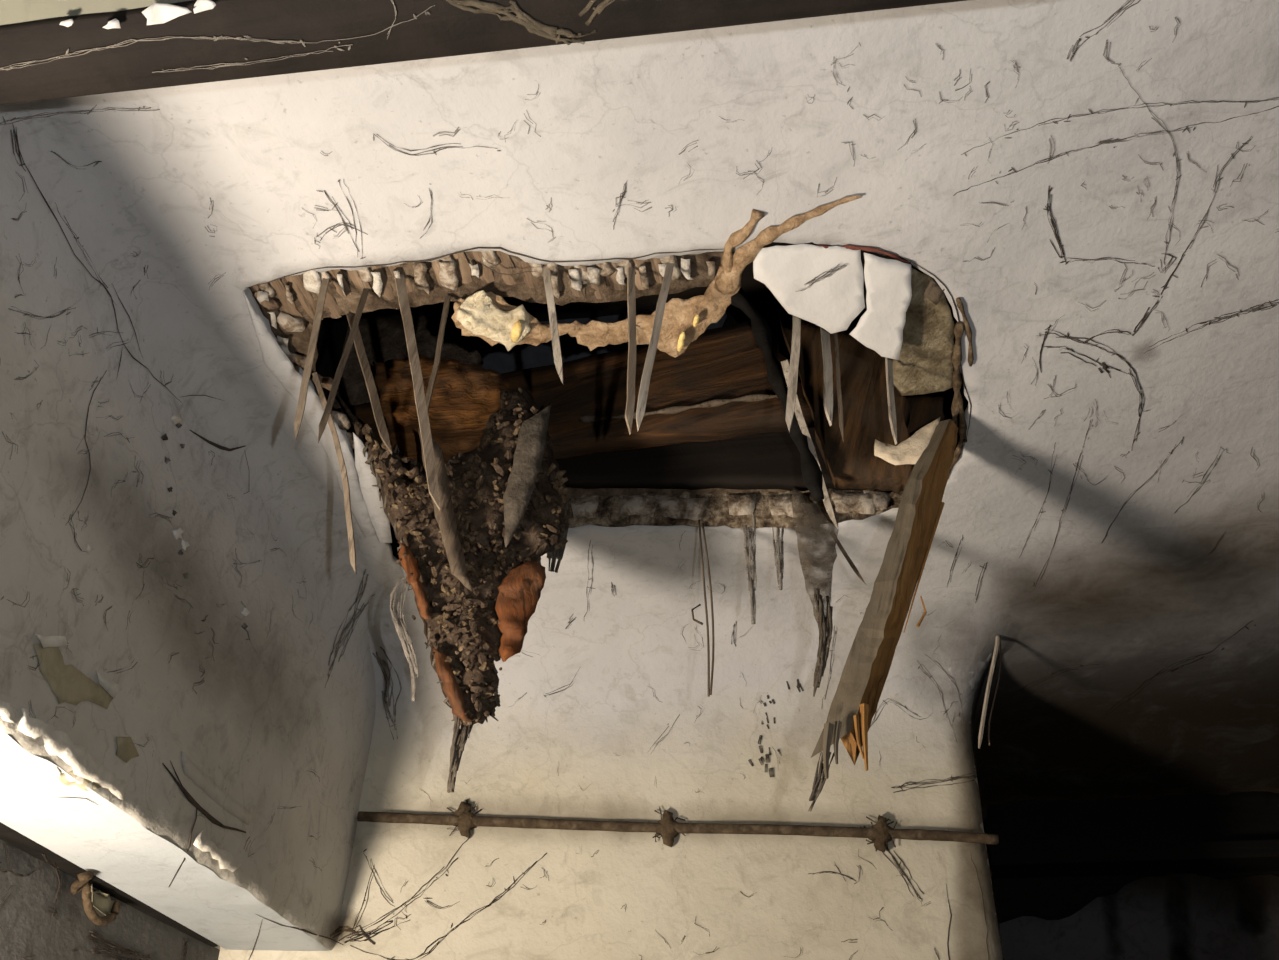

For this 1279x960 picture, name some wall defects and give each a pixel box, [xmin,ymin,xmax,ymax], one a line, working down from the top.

crack [12,123,224,526]
peeling [753,244,974,474]
crack [911,261,960,322]
spalling [243,251,735,543]
crack [960,364,972,439]
crack [190,430,249,494]
spalling [565,487,903,528]
water stain [1031,537,1279,613]
peeling [33,634,121,709]
peeling [116,737,139,763]
water stain [961,723,1001,940]